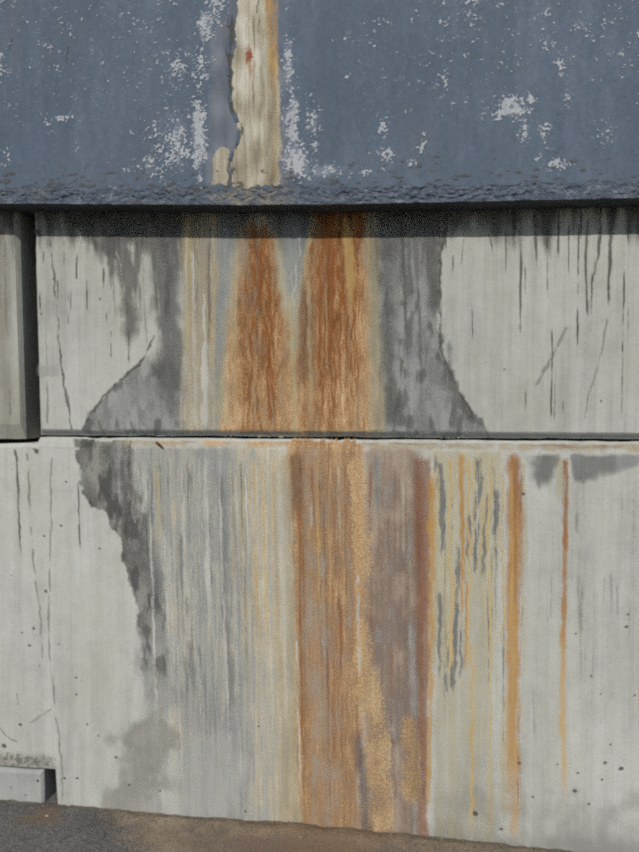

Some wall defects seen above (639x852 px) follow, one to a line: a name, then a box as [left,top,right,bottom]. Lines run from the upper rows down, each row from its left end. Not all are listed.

spalling [0,0,639,205]
crack [49,243,57,296]
crack [57,320,72,429]
corrosion [205,212,435,836]
leakage [63,207,639,852]
corrosion [506,455,522,782]